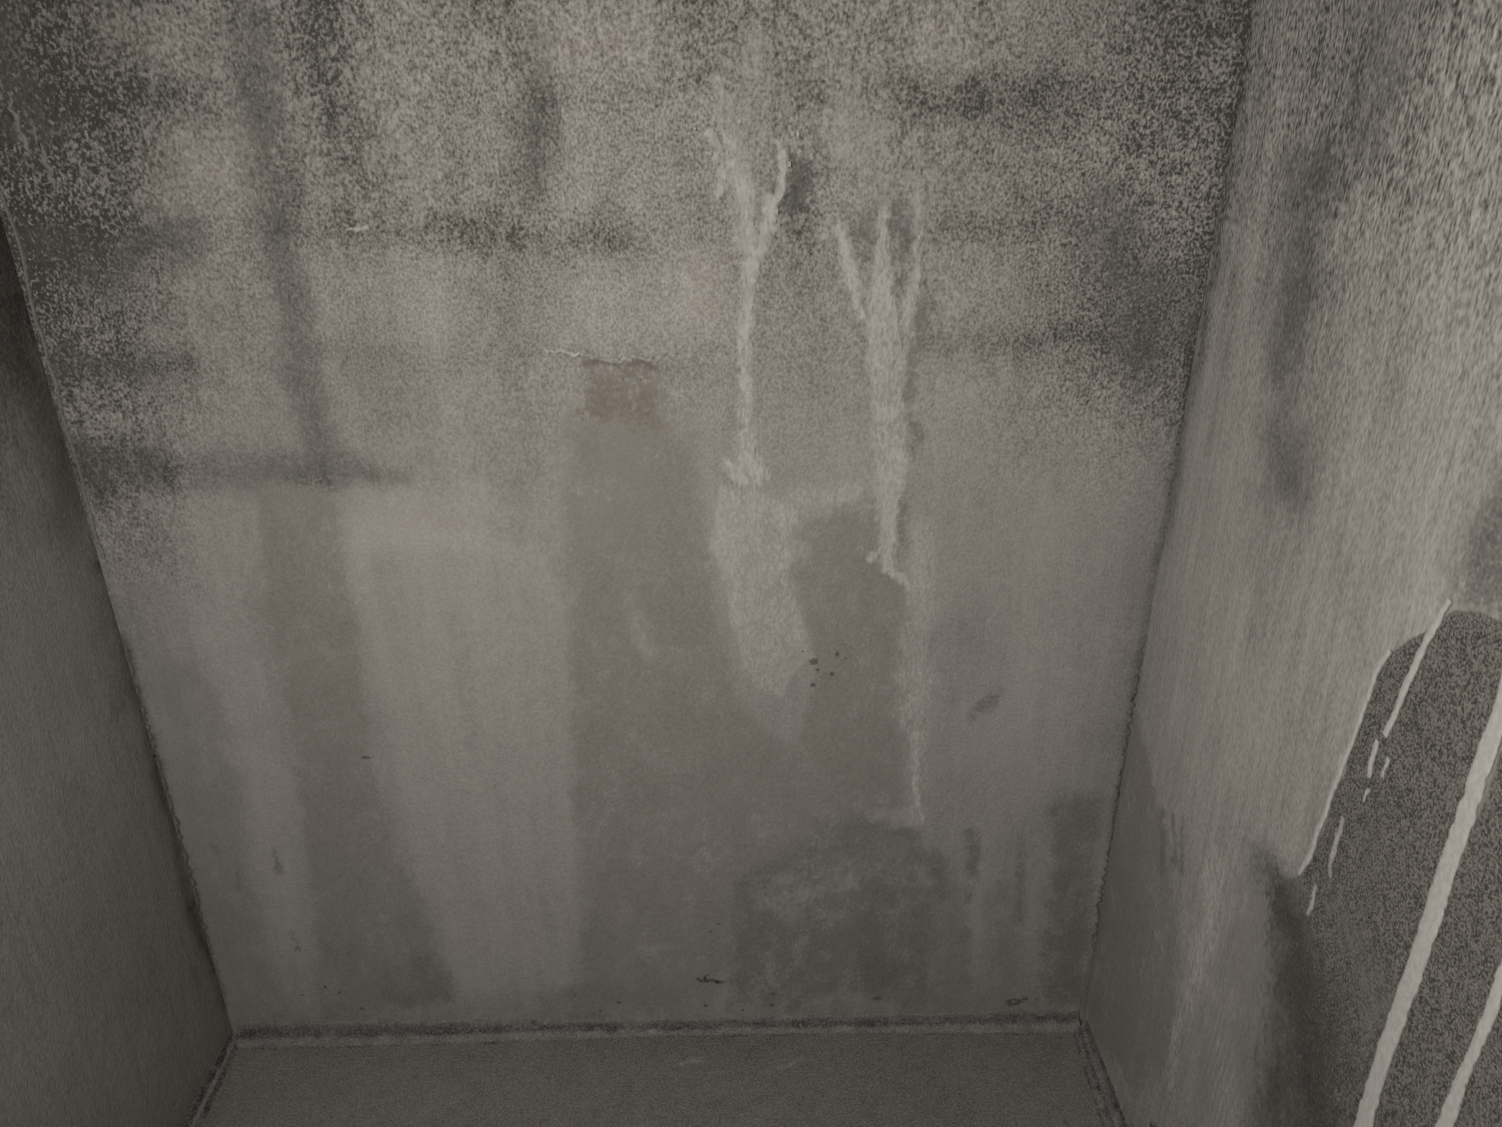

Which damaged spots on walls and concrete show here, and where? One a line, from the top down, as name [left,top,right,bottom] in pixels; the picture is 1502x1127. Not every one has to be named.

leakage [562,76,1502,1127]